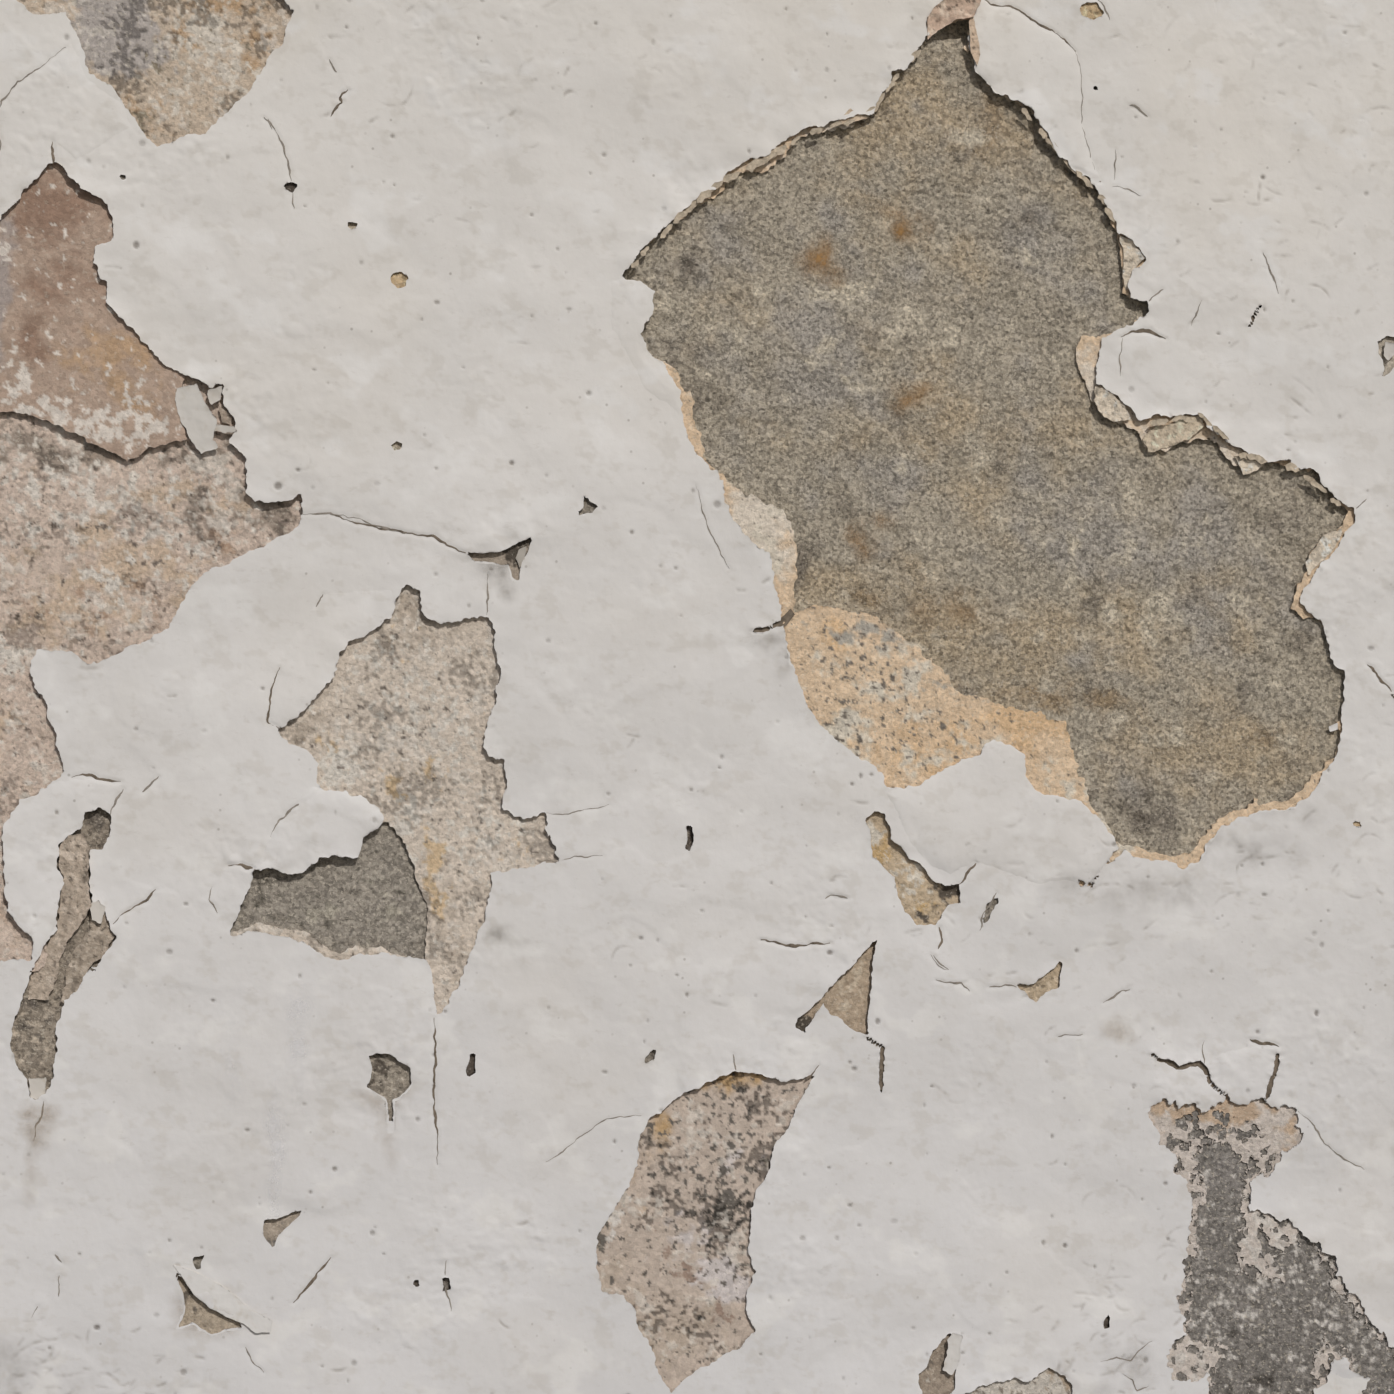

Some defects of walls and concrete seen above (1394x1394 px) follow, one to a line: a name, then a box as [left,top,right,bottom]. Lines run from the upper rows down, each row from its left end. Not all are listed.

peeling [17,0,293,147]
peeling [623,0,1355,887]
peeling [0,162,303,1100]
crack [266,667,280,729]
crack [304,512,489,615]
peeling [230,585,559,1014]
peeling [865,811,961,925]
peeling [795,941,876,1035]
crack [1151,1042,1225,1096]
crack [1250,1039,1361,1167]
peeling [596,1071,814,1393]
peeling [1148,1094,1394,1394]